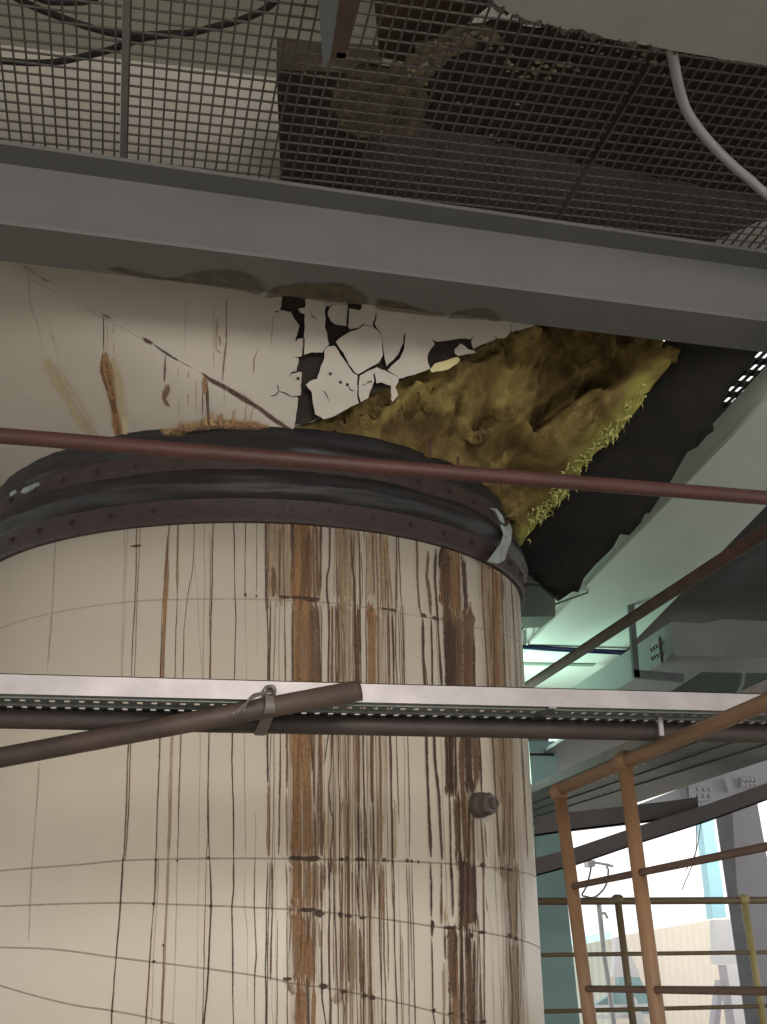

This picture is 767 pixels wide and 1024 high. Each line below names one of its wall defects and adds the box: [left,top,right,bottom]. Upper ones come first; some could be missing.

corrosion [100,314,127,436]
corrosion [161,300,290,434]
peeling [298,299,534,419]
corrosion [233,523,405,684]
corrosion [416,541,518,687]
corrosion [254,734,528,1024]